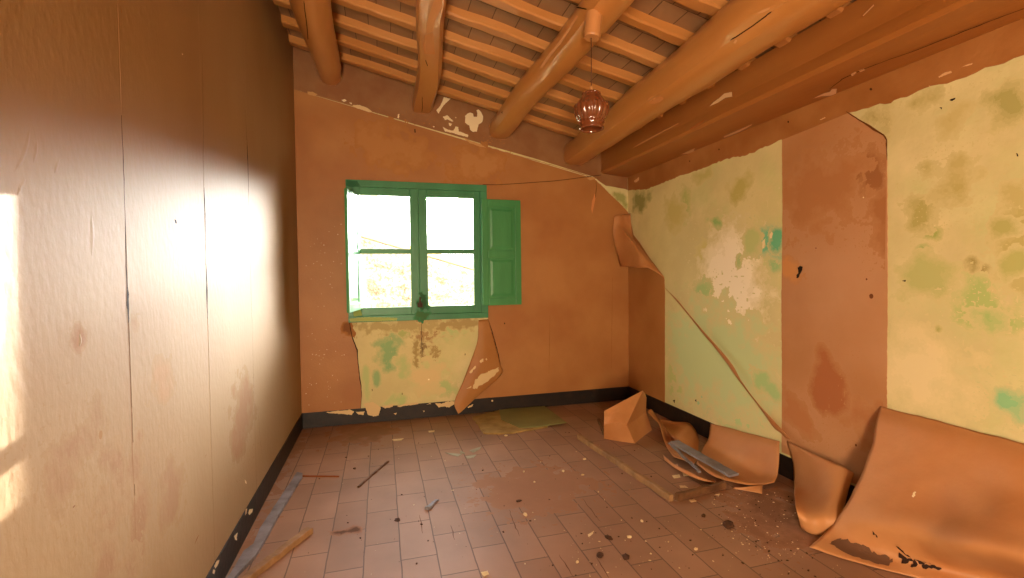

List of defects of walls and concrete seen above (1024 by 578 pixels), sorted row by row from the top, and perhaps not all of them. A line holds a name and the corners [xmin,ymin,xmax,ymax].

peeling [433,97,596,180]
crack [121,115,136,539]
crack [202,193,210,366]
peeling [327,401,455,416]
damp [611,60,1024,457]